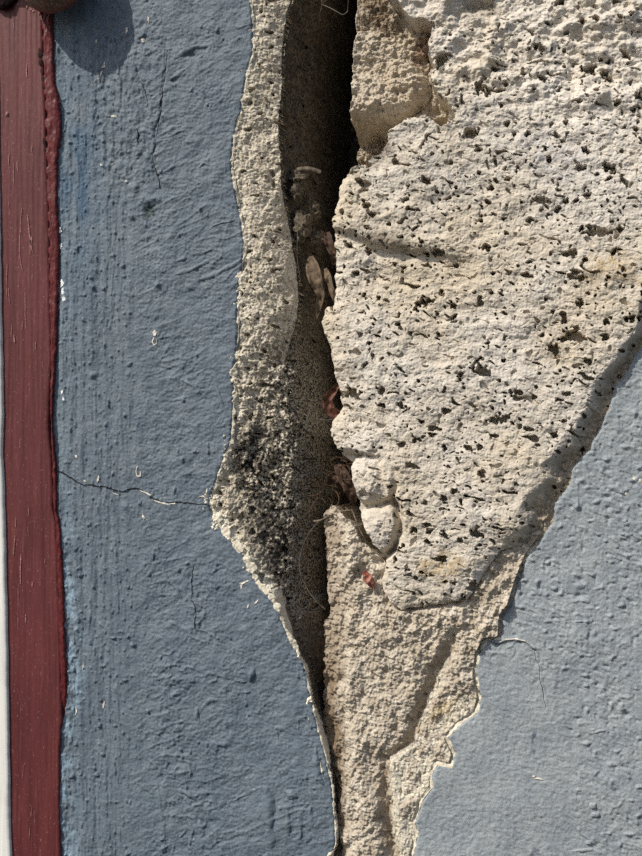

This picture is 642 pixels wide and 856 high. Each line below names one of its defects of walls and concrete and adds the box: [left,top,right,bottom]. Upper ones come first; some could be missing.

crack [57,0,360,853]
spalling [200,0,642,856]
crack [481,638,546,708]